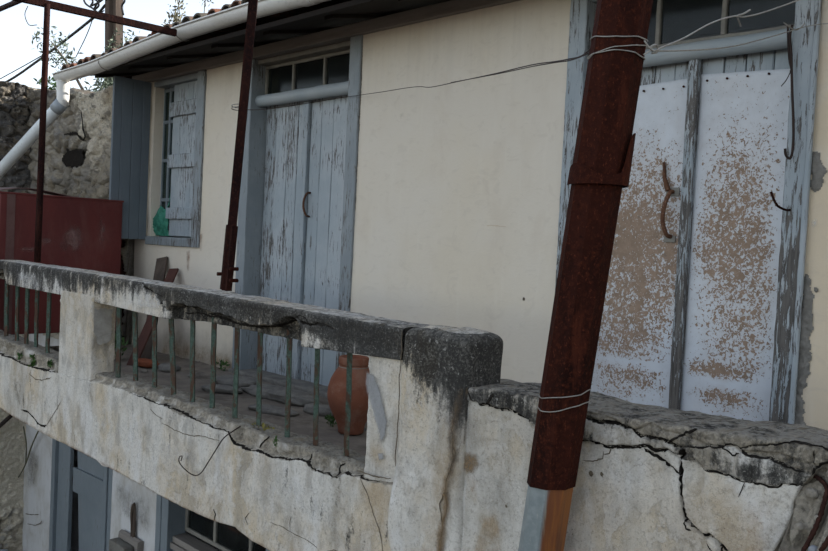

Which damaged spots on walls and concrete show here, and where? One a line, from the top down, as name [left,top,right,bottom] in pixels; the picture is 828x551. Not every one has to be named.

flaking render [810,151,827,192]
flaking render [794,274,818,425]
crack [357,330,403,551]
crack [583,417,828,551]
spalling [795,471,828,551]